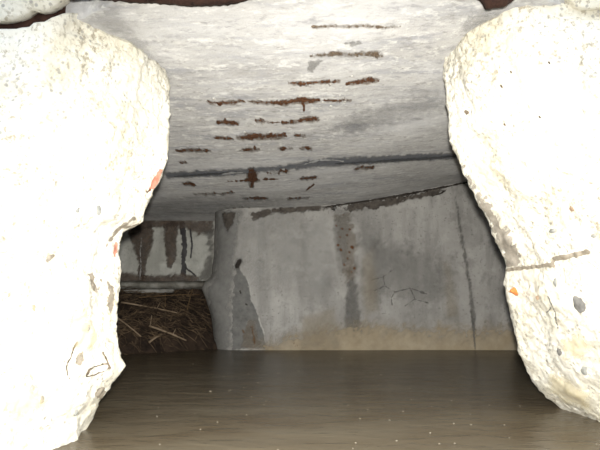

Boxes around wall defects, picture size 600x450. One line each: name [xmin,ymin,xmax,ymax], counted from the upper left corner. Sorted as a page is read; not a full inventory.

corrosion [310,51,382,59]
corrosion [292,75,379,87]
corrosion [207,94,349,151]
corrosion [228,168,288,188]
water stain [120,210,240,350]
water stain [263,252,518,350]
crack [372,271,428,306]